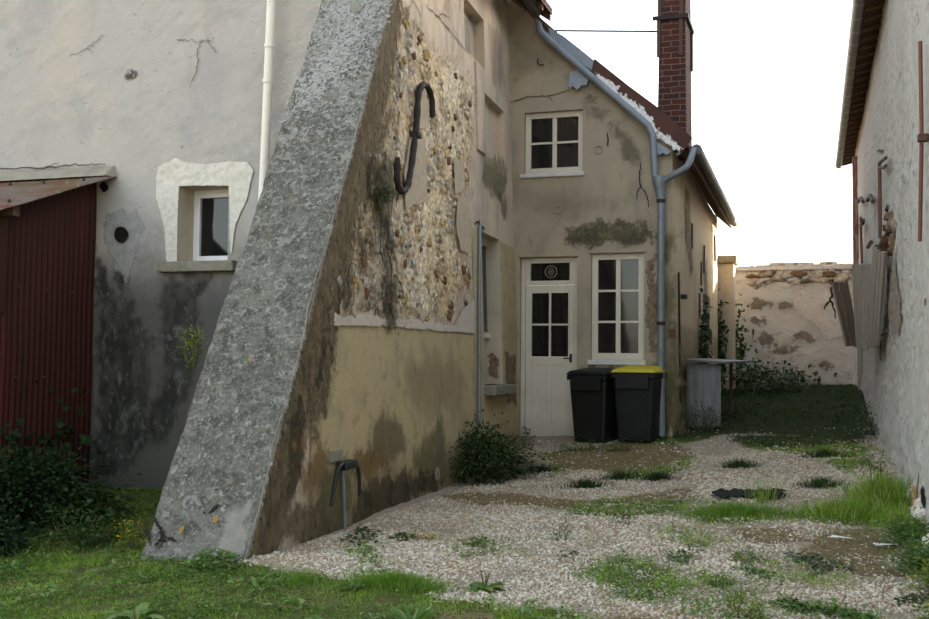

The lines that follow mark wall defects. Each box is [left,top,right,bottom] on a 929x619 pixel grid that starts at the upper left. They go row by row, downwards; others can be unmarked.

crack [177,37,217,84]
crack [510,90,567,103]
crack [0,162,104,170]
flaking render [334,19,475,334]
crack [636,162,649,207]
leakage [248,0,443,558]